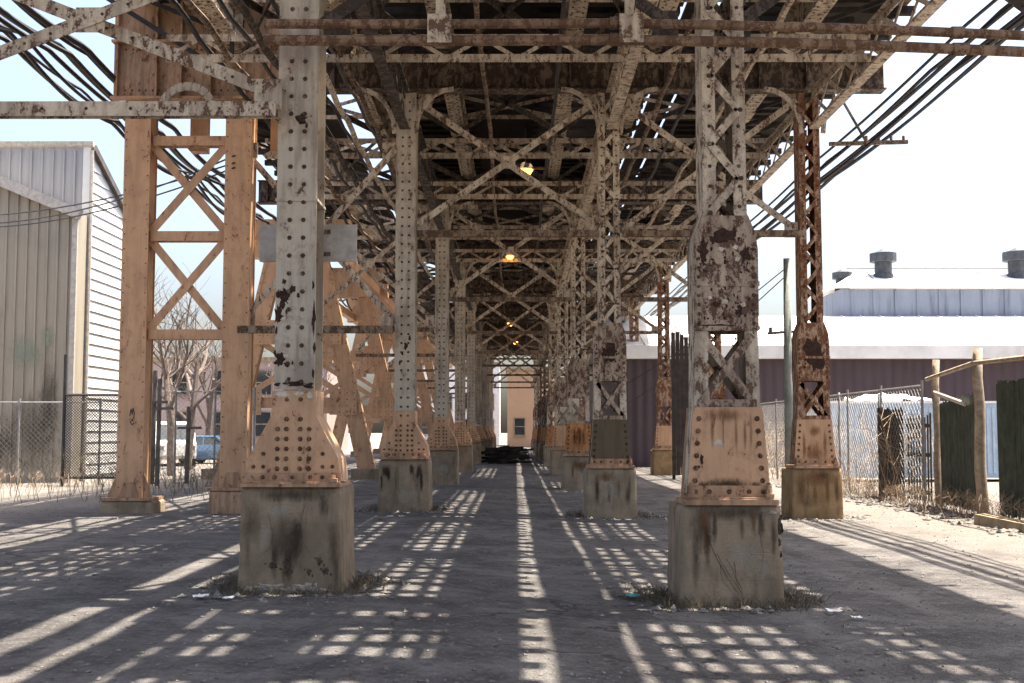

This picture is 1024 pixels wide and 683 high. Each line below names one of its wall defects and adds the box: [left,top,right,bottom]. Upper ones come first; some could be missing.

peeling [697,227,751,274]